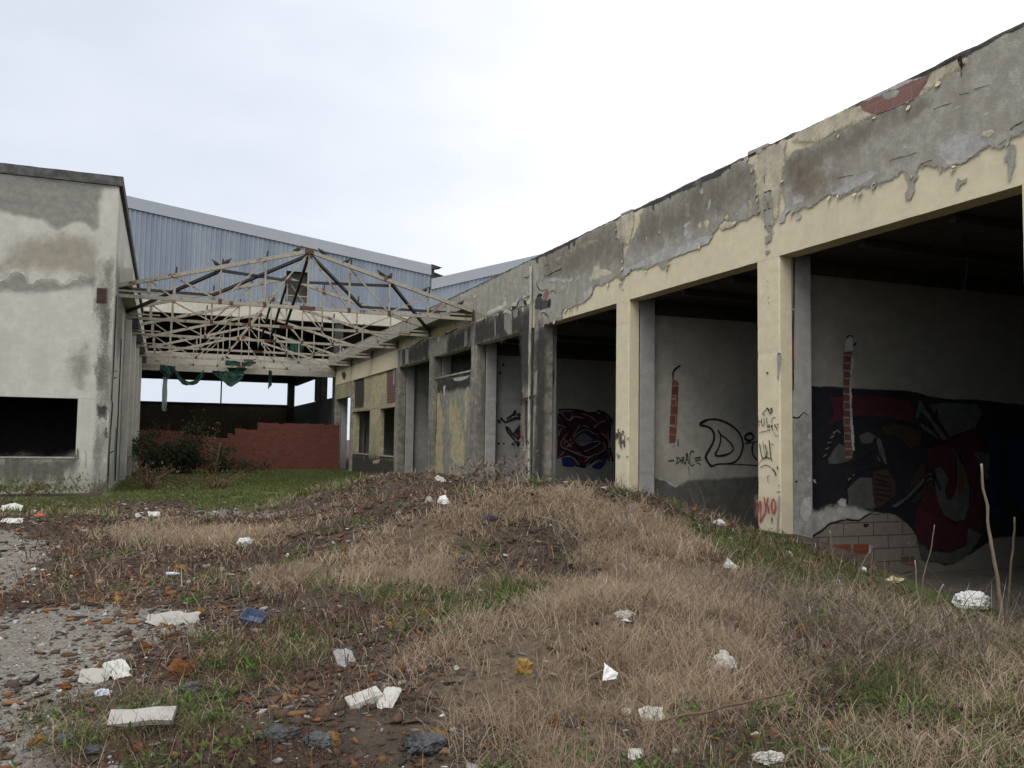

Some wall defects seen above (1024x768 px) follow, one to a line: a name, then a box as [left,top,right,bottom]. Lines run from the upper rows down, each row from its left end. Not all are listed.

leakage [0,270,93,290]
leakage [0,178,101,227]
peeling [474,24,1024,326]
leakage [91,266,123,493]
flaking render [793,412,920,573]